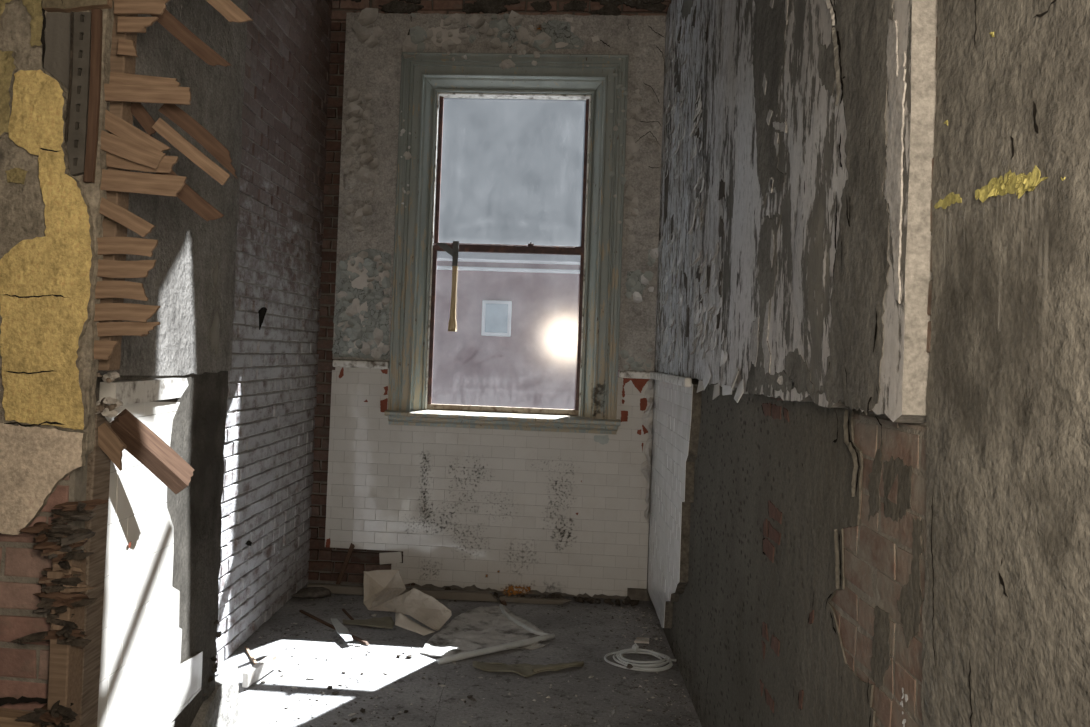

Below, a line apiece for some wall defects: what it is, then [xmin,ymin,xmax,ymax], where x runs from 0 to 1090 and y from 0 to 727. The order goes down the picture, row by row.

peeling [0,49,123,712]
leakage [421,455,484,548]
peeling [326,0,962,727]
peeling [975,165,1065,203]